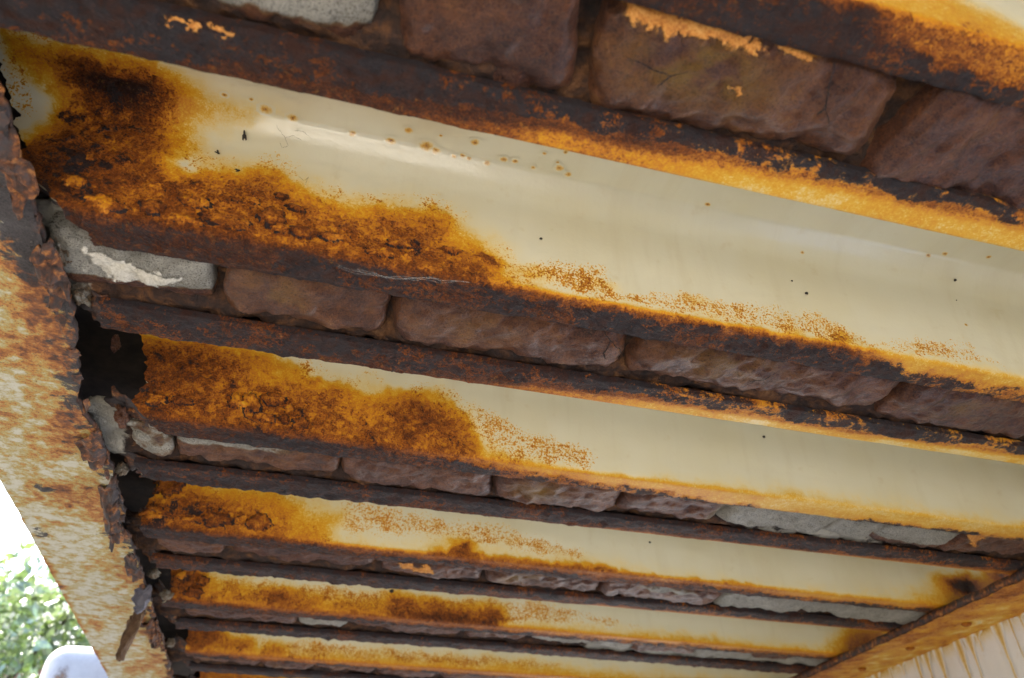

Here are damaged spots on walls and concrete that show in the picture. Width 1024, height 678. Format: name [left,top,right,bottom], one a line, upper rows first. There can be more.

rust [0,0,1024,403]
rust [0,106,174,678]
rust [95,296,1024,541]
rust [133,457,1024,613]
rust [151,553,1024,678]